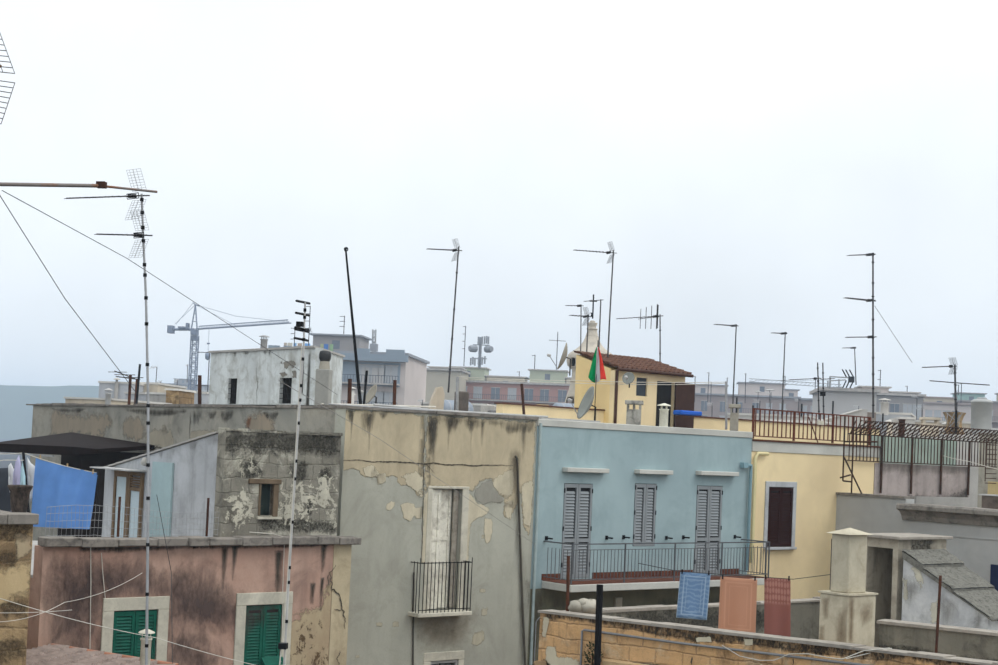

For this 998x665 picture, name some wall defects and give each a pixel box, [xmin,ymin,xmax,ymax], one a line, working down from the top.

leakage [429,417,437,444]
leakage [449,417,483,428]
mould [225,433,338,481]
peeling [222,450,258,535]
mould [261,498,337,533]
peeling [278,470,338,529]
peeling [343,410,536,563]
leakage [1,601,27,617]
leakage [52,563,254,651]
crack [327,565,346,627]
leakage [174,636,207,665]
peeling [542,617,579,665]